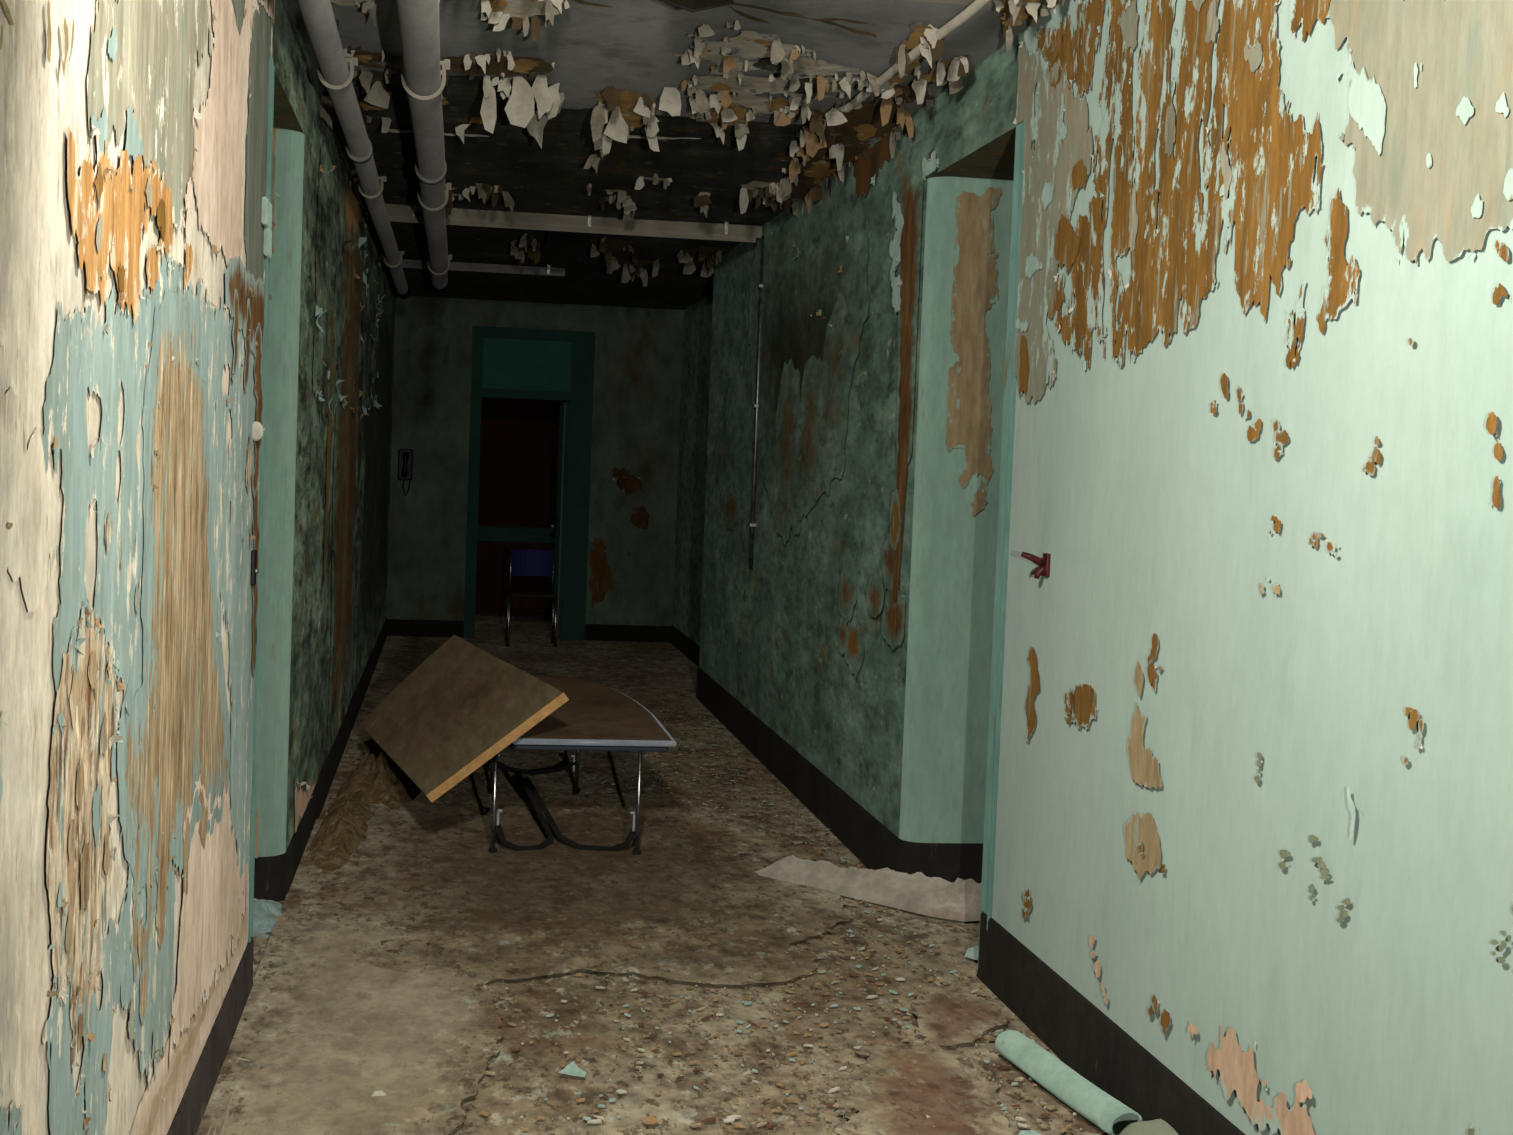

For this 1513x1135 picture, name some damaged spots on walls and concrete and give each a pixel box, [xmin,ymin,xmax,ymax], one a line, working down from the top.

peeling [440,0,570,149]
peeling [584,20,971,221]
peeling [992,0,1513,404]
water stain [443,108,869,545]
peeling [945,187,1002,516]
peeling [1210,373,1289,460]
peeling [1485,412,1503,508]
peeling [41,0,281,1135]
water stain [117,285,231,1025]
peeling [1065,684,1098,730]
peeling [1127,633,1163,789]
spalling [1148,994,1316,1135]